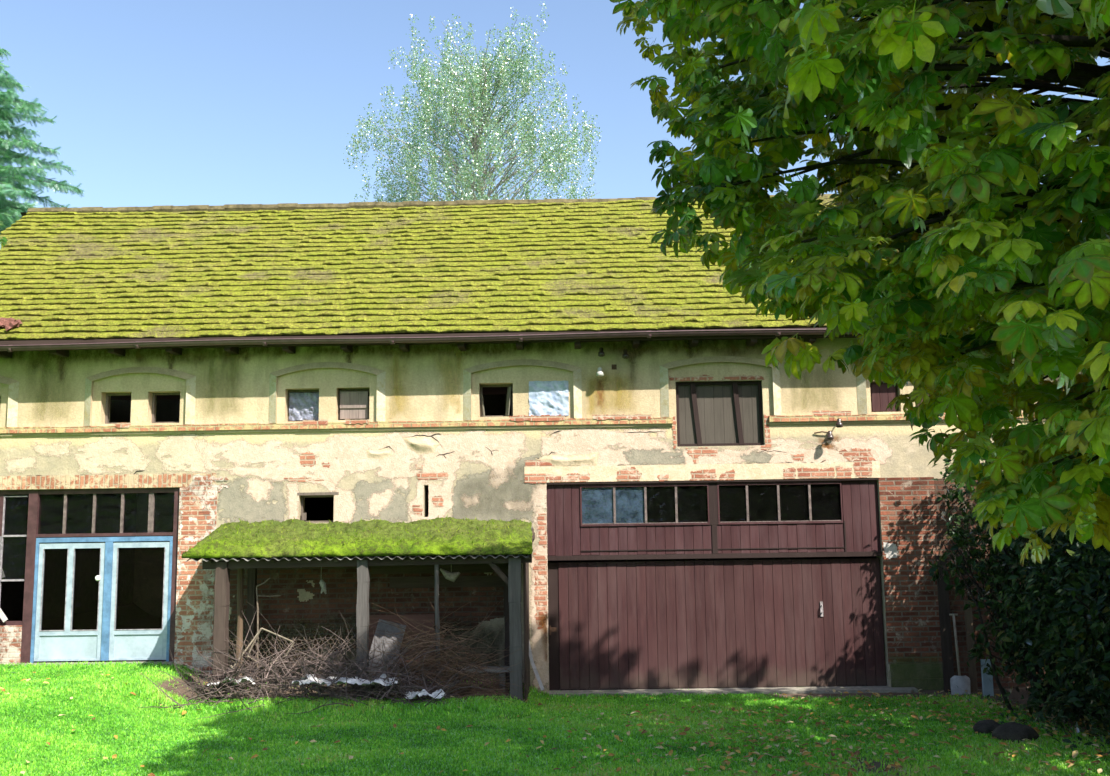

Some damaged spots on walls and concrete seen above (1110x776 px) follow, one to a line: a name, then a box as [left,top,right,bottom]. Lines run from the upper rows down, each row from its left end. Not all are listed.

damp [6,347,287,379]
damp [309,342,565,371]
damp [586,339,782,364]
peeling [5,414,893,689]